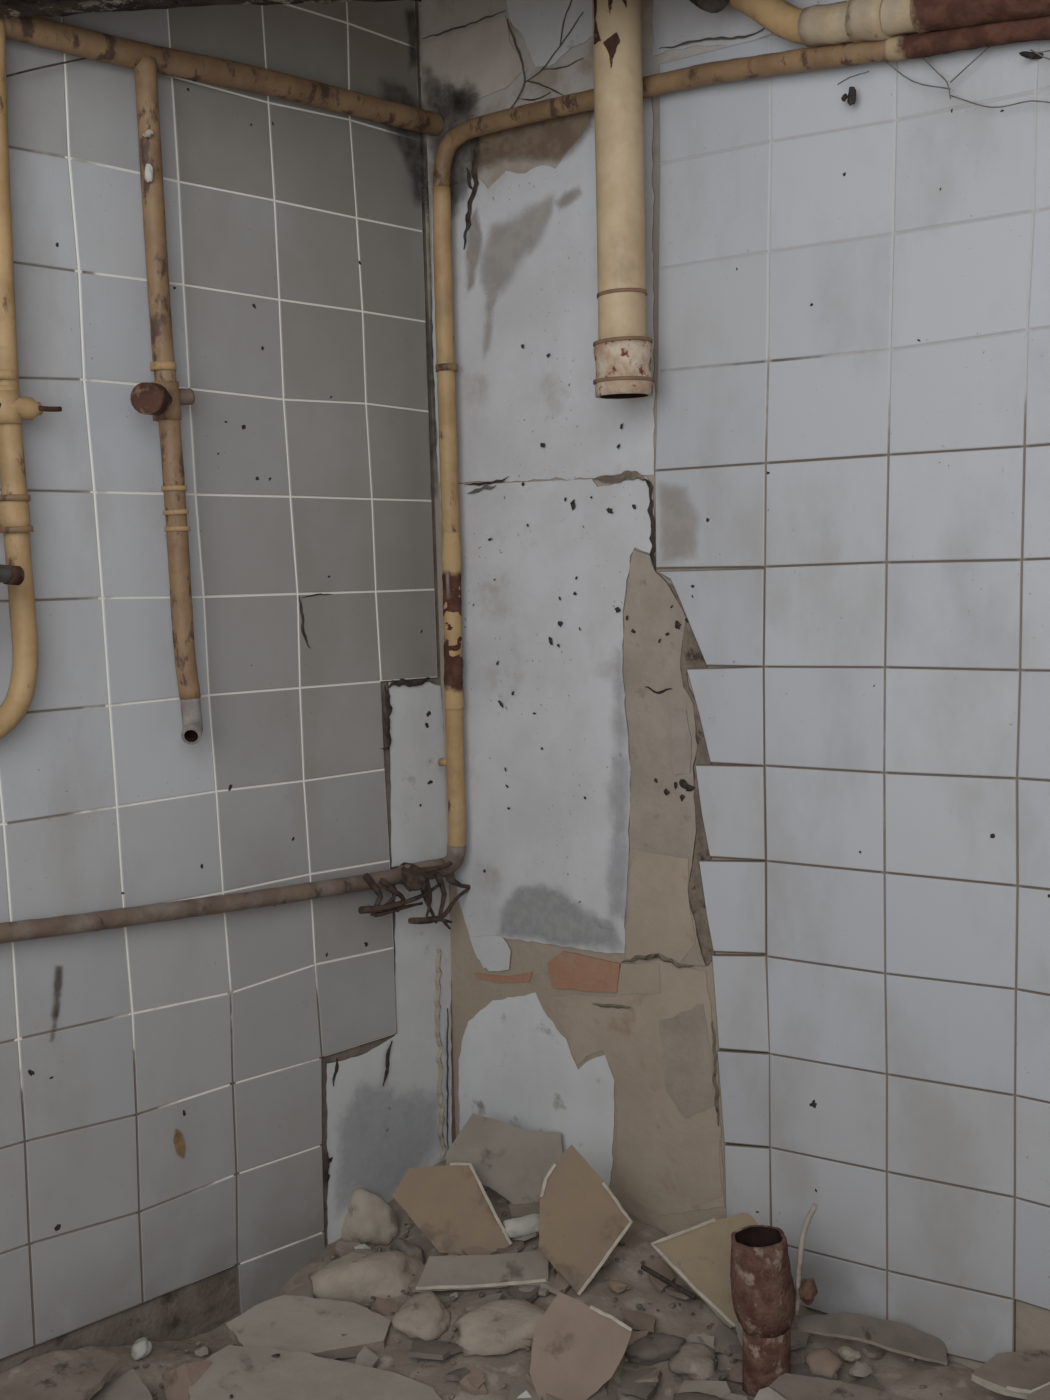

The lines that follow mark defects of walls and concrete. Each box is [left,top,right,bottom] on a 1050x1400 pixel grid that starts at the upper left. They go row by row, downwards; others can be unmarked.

crack [421,0,584,108]
corrosion [884,0,1050,62]
leakage [385,80,476,223]
leakage [450,110,592,208]
leakage [483,202,550,299]
leakage [428,245,437,474]
peeling [326,97,758,1400]
leakage [502,761,623,945]